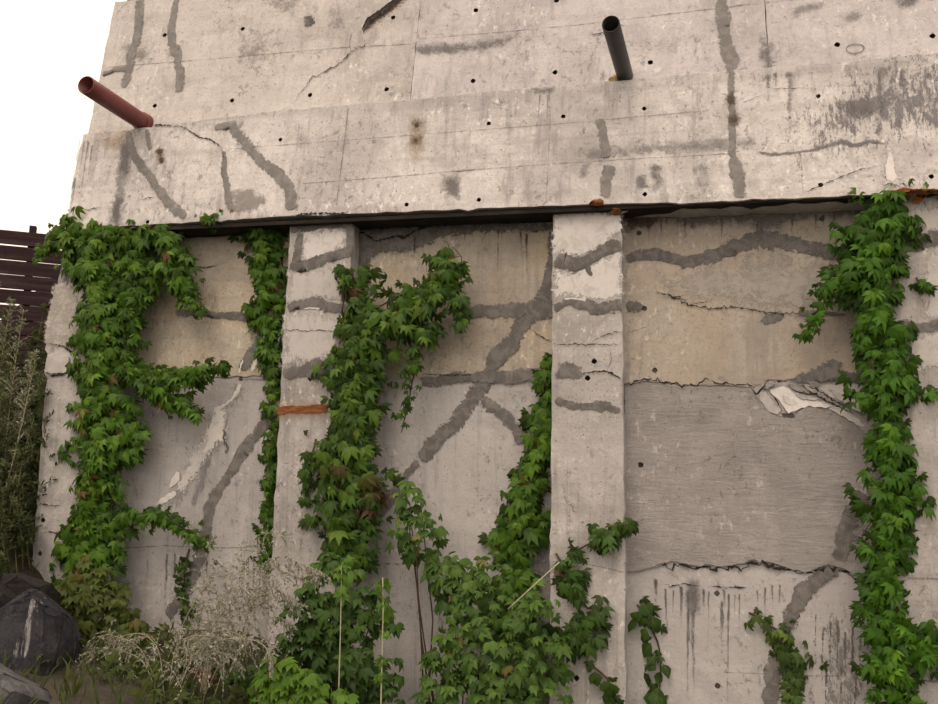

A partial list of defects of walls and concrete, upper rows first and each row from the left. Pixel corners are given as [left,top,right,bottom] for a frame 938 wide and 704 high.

crack [167,0,185,92]
spalling [362,0,407,35]
crack [714,0,809,197]
leakage [760,42,938,164]
leakage [636,166,661,188]
leakage [589,139,751,158]
crack [125,118,862,518]
rust [277,403,328,416]
peeling [752,377,874,433]
leakage [654,579,710,656]
leakage [720,590,740,643]
crack [654,490,869,704]